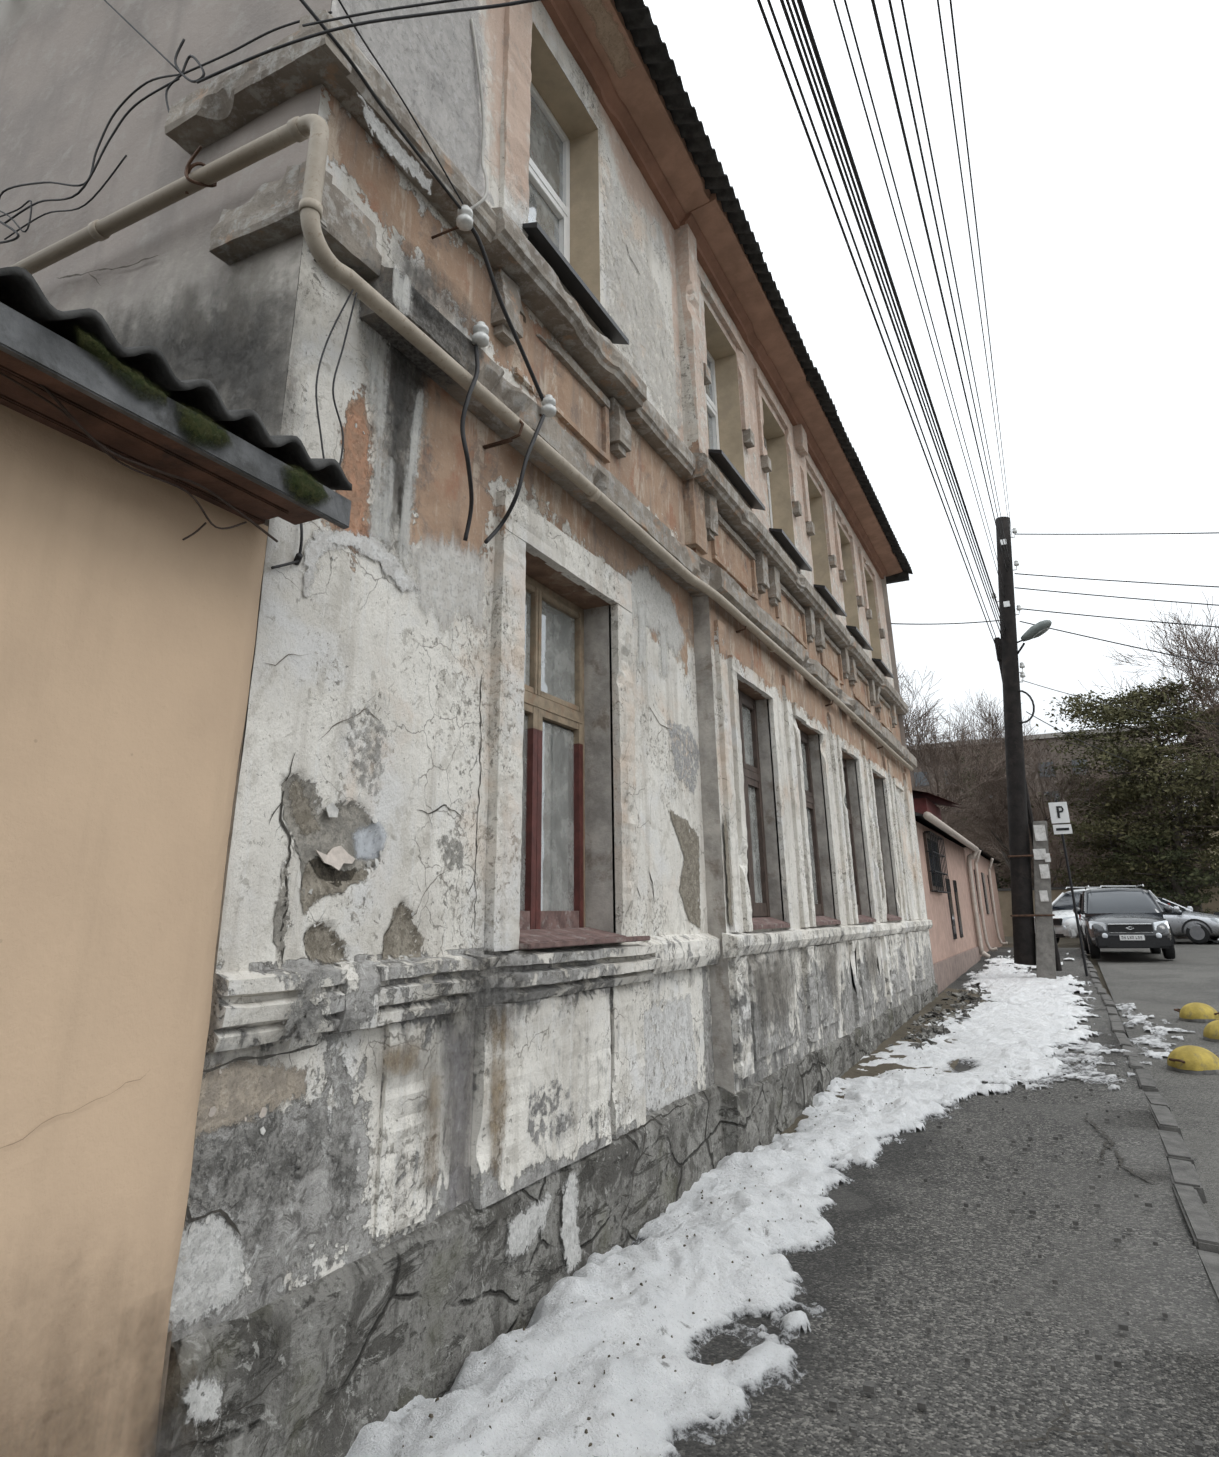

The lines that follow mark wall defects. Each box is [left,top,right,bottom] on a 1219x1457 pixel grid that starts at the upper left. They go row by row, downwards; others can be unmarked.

peeling [358,95,432,195]
damp [107,290,296,435]
crack [269,702,380,964]
flaking render [273,704,388,965]
crack [413,674,482,933]
flaking render [668,810,701,928]
damp [756,957,793,1014]
damp [826,953,837,991]
crack [1,1072,148,1148]
flaking render [168,1060,307,1332]
damp [434,1032,473,1202]
crack [618,1103,687,1221]